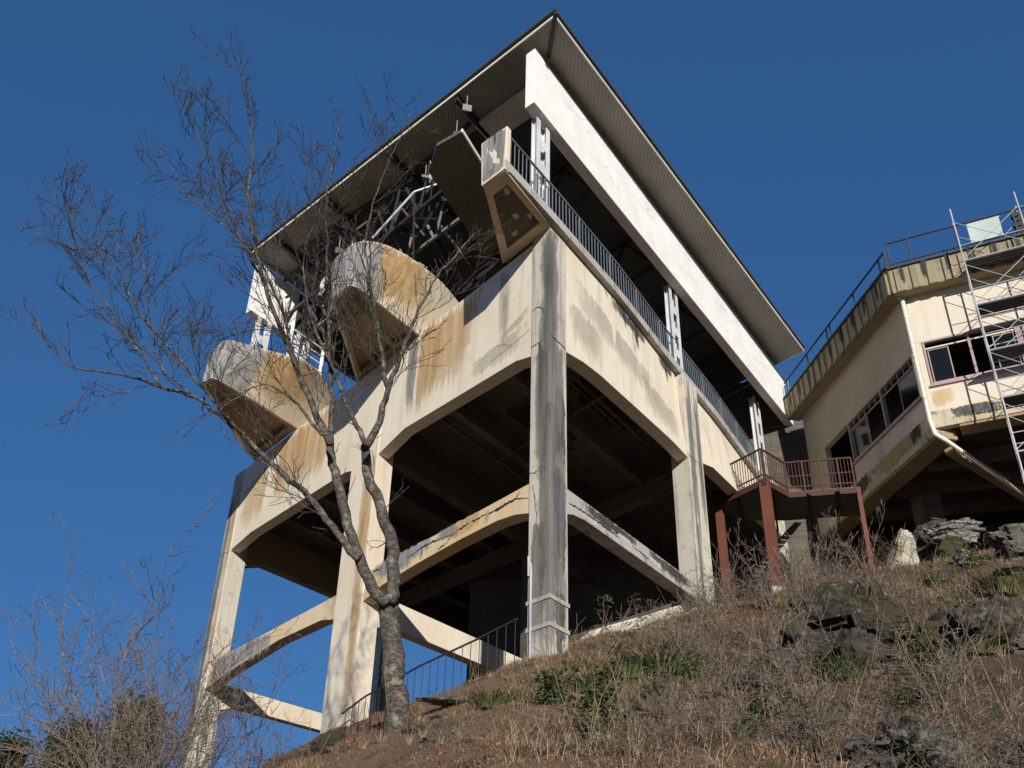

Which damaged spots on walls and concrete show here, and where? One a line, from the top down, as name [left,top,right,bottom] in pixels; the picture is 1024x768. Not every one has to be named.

rust [377,245,426,302]
rust [259,351,315,399]
rust [416,294,476,403]
damp [531,230,566,641]
damp [611,296,645,347]
damp [951,401,1002,417]
rust [227,406,329,555]
rust [358,482,370,552]
crack [408,466,542,559]
crack [569,503,649,559]
rust [344,567,360,692]